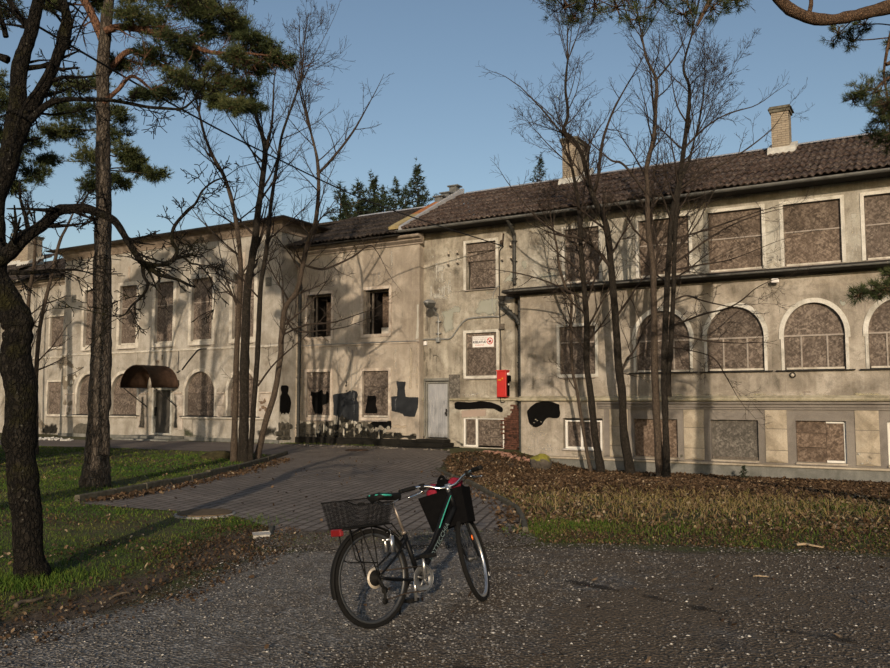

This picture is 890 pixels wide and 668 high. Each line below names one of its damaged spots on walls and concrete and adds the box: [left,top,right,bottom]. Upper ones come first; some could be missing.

flaking render [58,357,82,390]
flaking render [500,405,519,450]